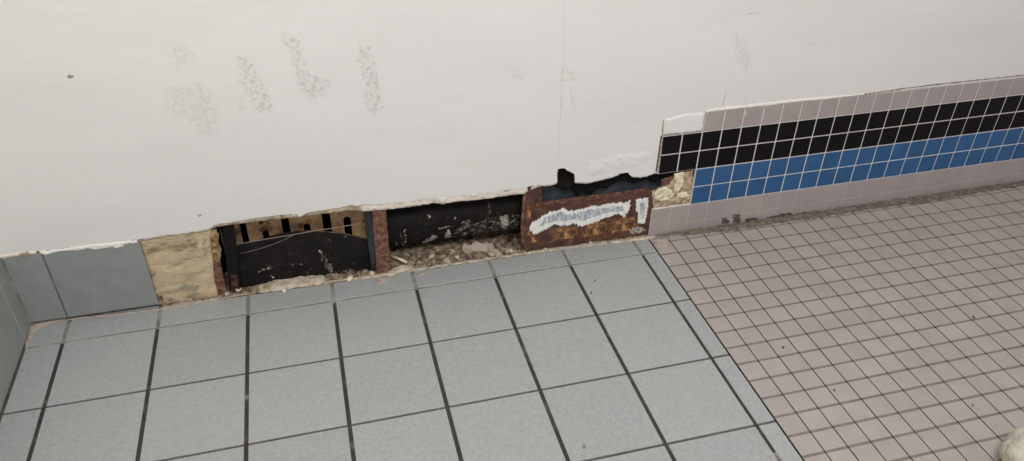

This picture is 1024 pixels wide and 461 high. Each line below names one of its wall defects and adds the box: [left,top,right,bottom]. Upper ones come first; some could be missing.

spalling [574,164,654,184]
peeling [651,169,694,208]
peeling [0,183,556,305]
corrosion [555,218,635,239]